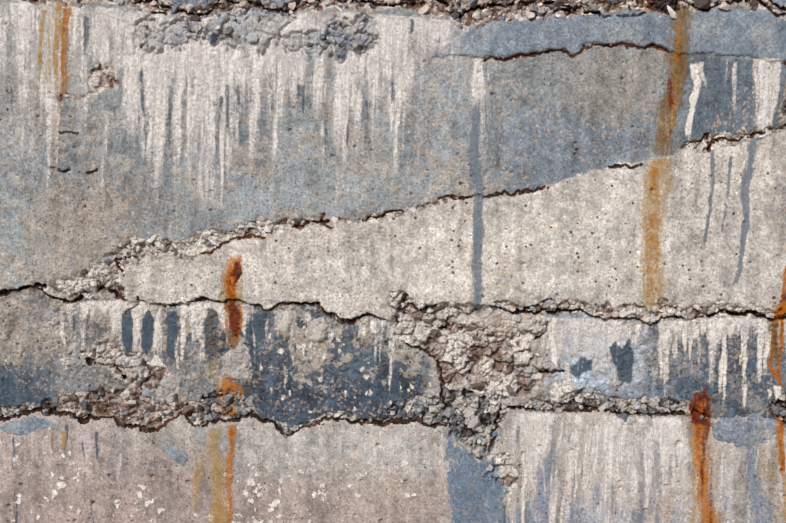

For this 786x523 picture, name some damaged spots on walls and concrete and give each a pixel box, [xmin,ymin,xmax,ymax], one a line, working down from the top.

crack [135,0,605,49]
peeling [11,0,786,63]
crack [483,42,674,62]
water stain [0,2,497,314]
rust [640,0,691,311]
spalling [683,77,786,154]
rust [207,257,243,351]
spalling [0,290,786,496]
crack [492,298,786,340]
water stain [539,317,786,408]
water stain [440,410,692,523]
rust [686,388,721,523]